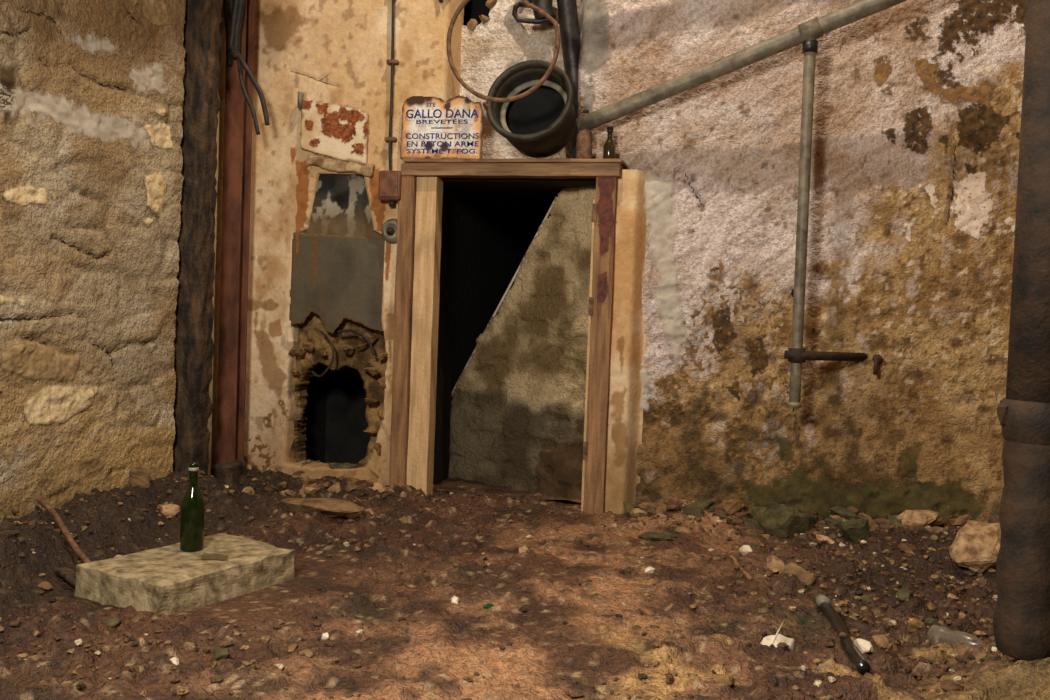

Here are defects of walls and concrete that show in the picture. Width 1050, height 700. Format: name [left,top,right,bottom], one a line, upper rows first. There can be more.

damp [904,0,1028,88]
peeling [882,58,1022,242]
spalling [244,312,388,482]